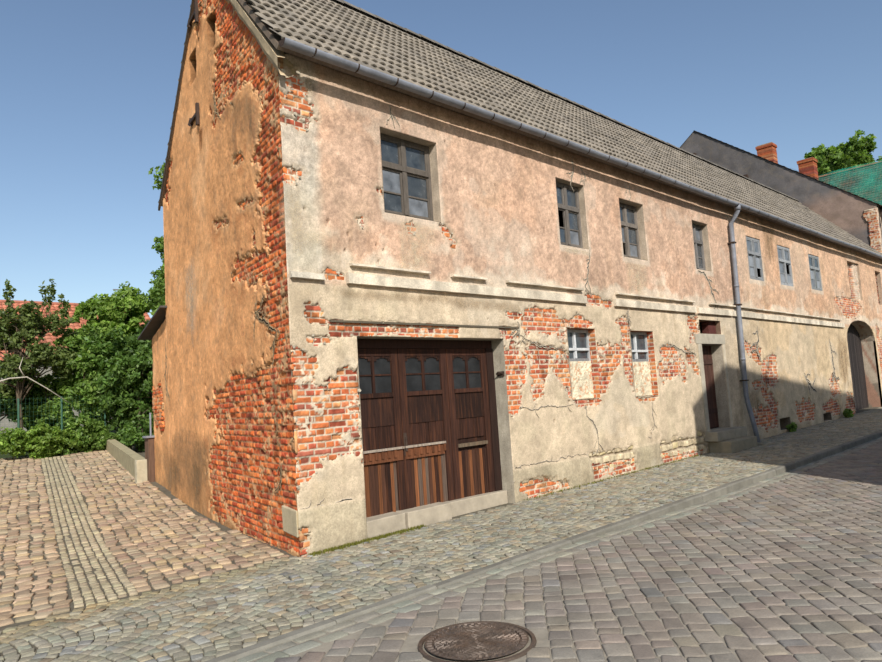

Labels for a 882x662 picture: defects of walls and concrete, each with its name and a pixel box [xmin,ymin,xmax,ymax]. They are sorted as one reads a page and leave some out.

crack [254,296,277,367]
spalling [194,0,459,557]
spalling [499,306,633,416]
crack [583,247,592,296]
spalling [585,294,612,309]
spalling [657,315,700,384]
spalling [744,340,779,432]
spalling [795,373,856,423]
spalling [519,477,570,498]
crack [512,404,604,485]
flaking render [589,445,637,480]